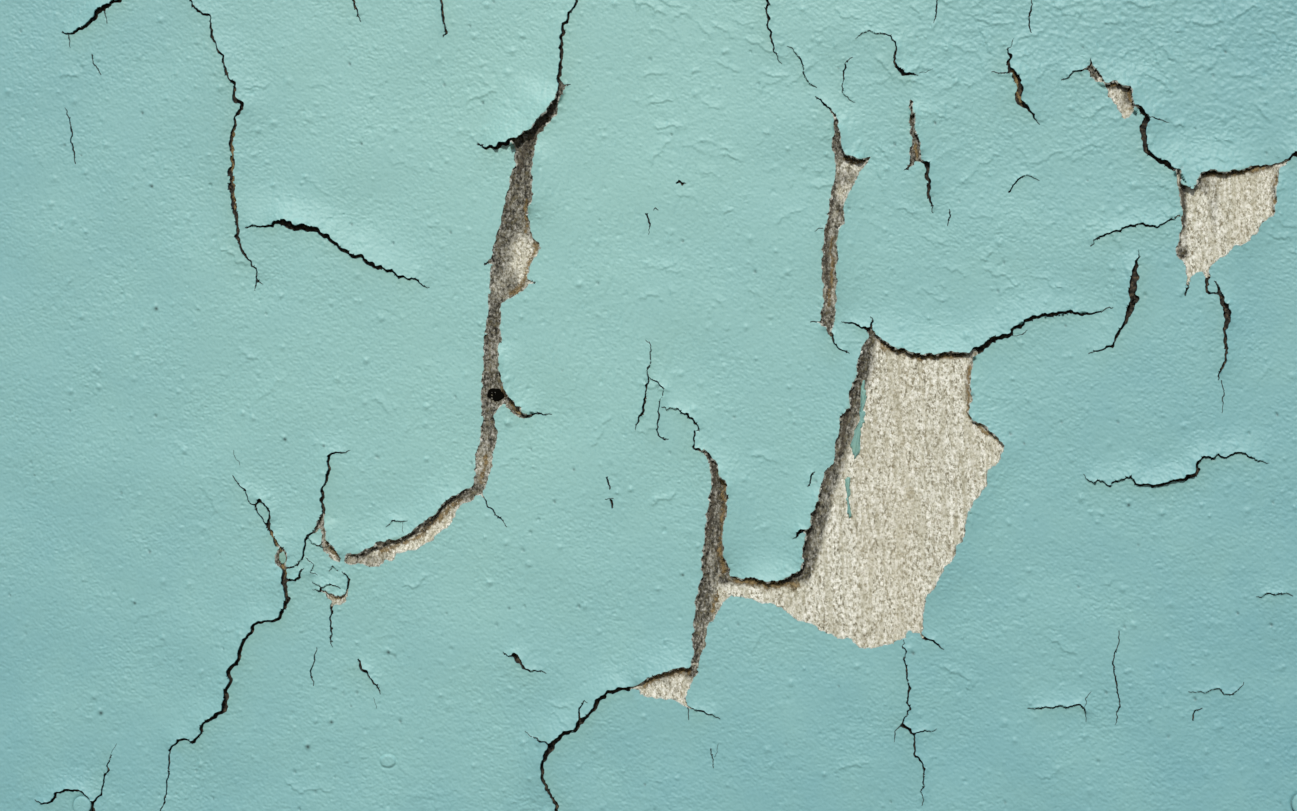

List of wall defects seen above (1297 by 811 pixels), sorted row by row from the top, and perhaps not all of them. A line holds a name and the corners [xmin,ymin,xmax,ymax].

crack [65,108,76,164]
crack [62,0,122,75]
crack [190,0,439,288]
crack [440,0,448,37]
peeling [1061,51,1297,299]
peeling [276,0,578,647]
peeling [518,46,1113,811]
crack [1088,215,1180,354]
crack [1083,281,1269,488]
crack [35,745,116,811]
crack [154,433,350,811]
crack [894,640,936,805]